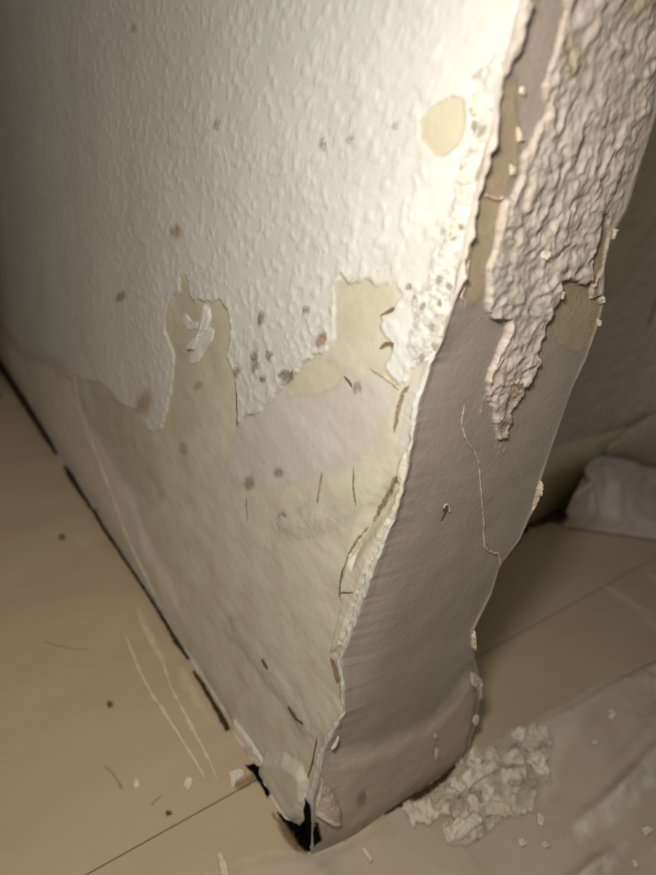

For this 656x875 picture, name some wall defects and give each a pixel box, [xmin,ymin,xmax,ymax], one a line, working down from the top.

peeling [75,0,612,855]
crack [461,405,501,567]